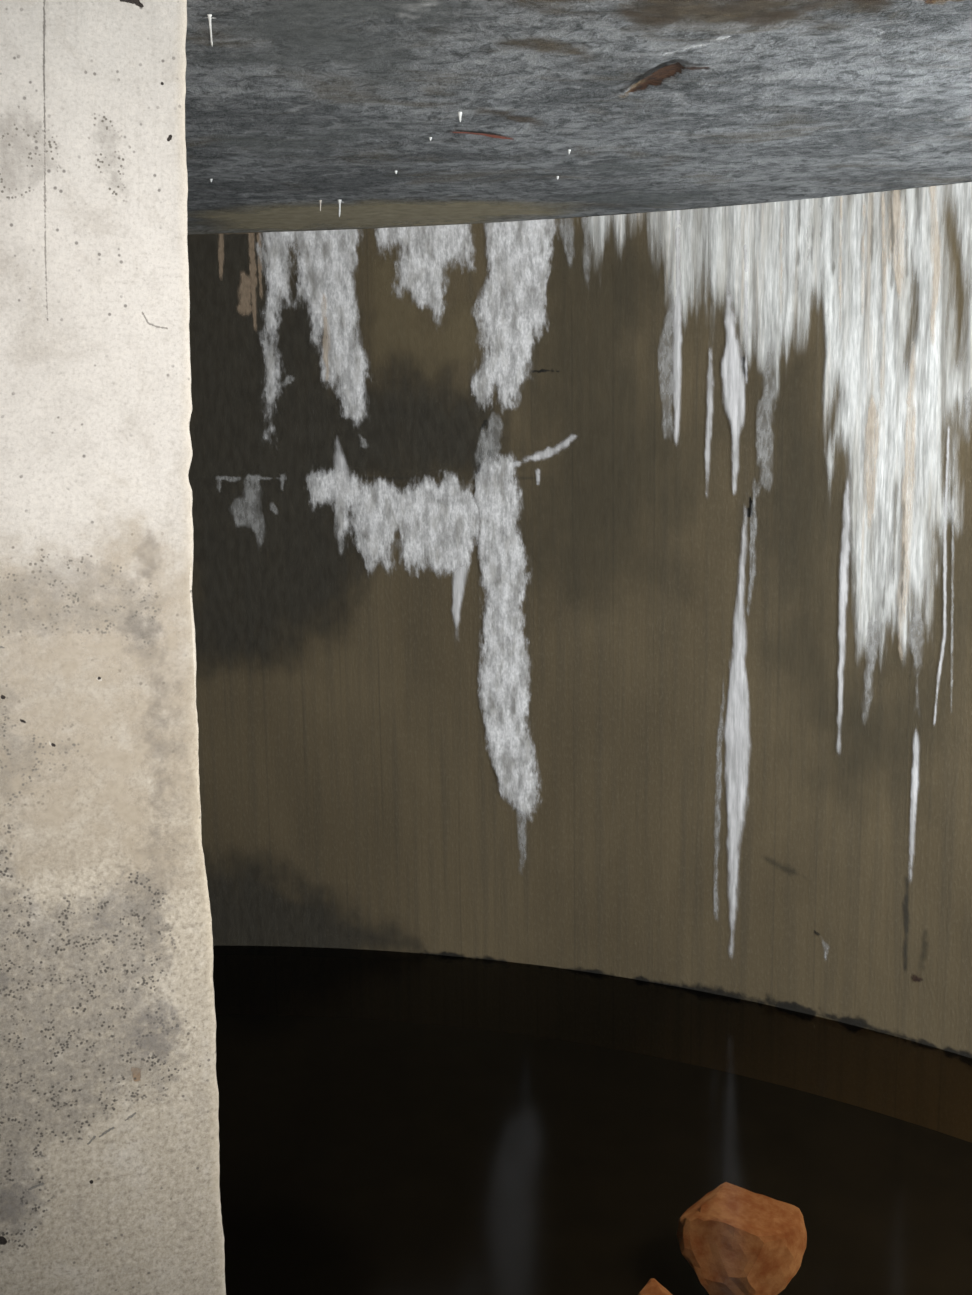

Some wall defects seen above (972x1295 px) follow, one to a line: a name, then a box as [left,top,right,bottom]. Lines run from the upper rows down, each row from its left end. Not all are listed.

water stain [0,556,156,637]
water stain [187,182,972,850]
water stain [714,499,756,927]